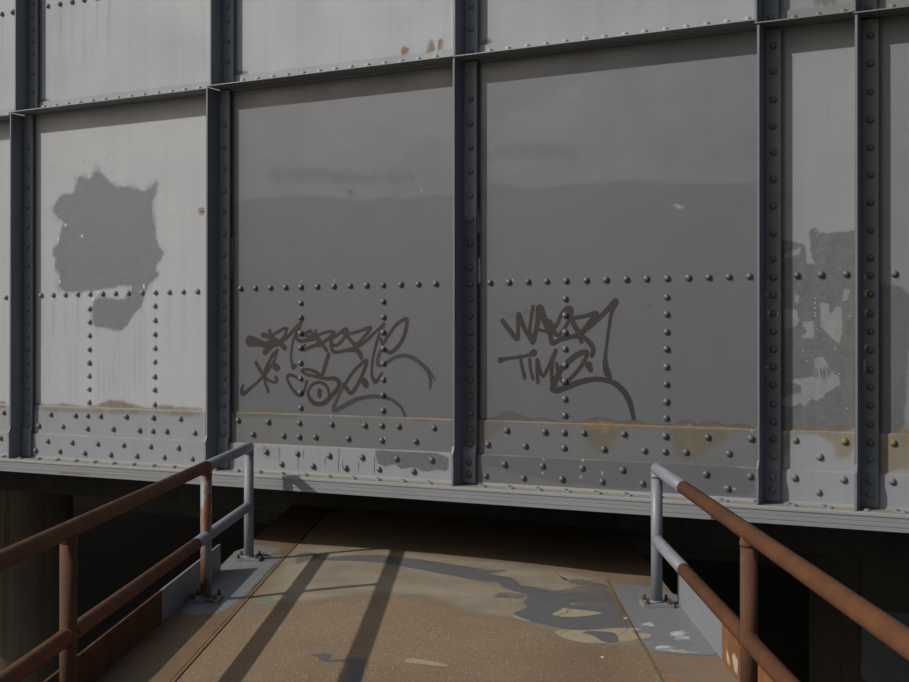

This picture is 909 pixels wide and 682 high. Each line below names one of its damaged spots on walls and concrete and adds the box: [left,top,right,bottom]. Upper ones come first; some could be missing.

peeling [767,289,850,349]
peeling [781,350,841,406]
corrosion [34,399,202,418]